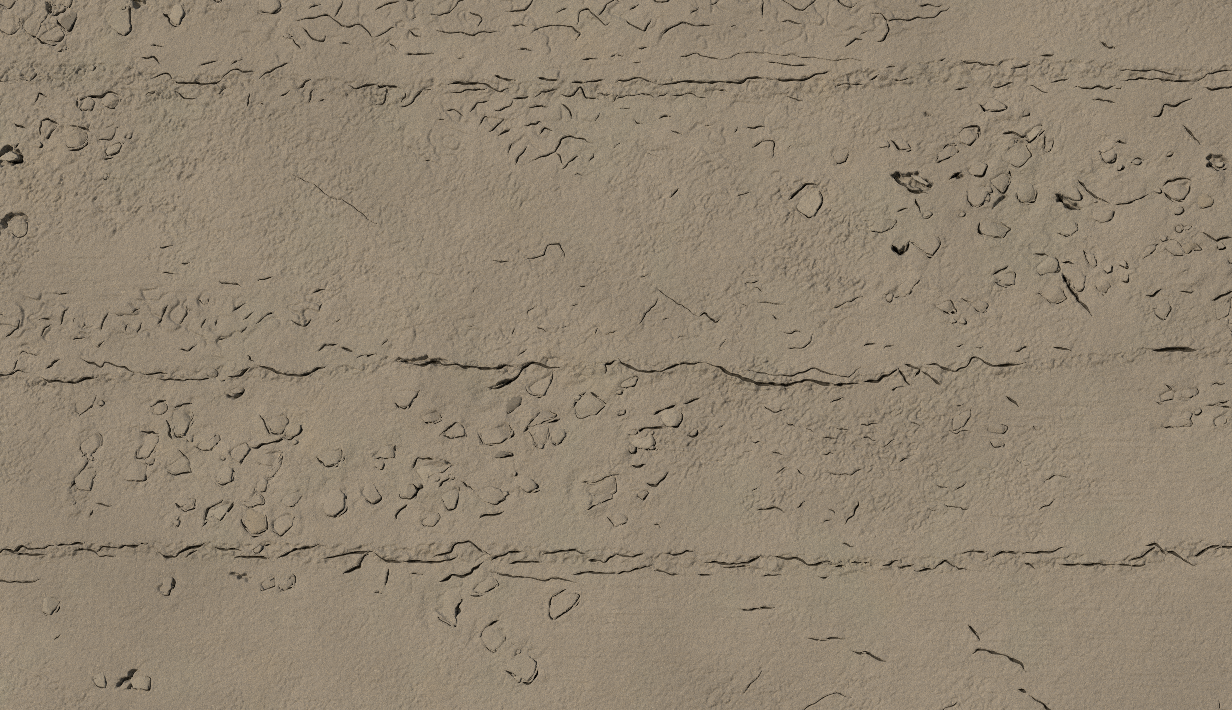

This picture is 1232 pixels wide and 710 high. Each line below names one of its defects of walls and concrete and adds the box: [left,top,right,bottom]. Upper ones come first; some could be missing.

crack [142,0,950,176]
crack [291,174,375,224]
crack [788,155,849,220]
crack [939,41,1232,354]
crack [160,245,190,275]
crack [493,243,566,264]
crack [0,276,587,390]
crack [594,274,1072,512]
crack [968,625,1052,710]